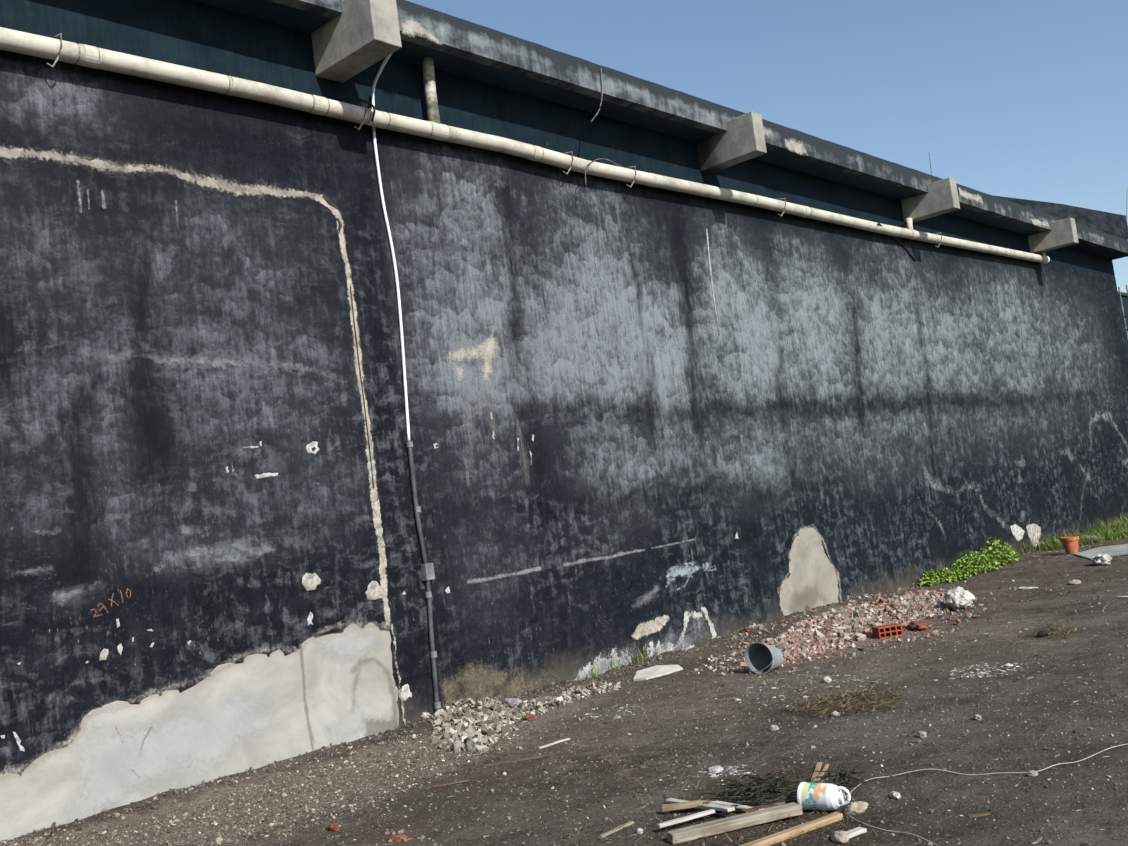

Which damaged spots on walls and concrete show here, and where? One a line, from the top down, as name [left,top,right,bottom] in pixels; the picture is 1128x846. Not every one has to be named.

flaking render [0,146,391,625]
leakage [673,213,697,410]
peeling [86,637,134,663]
peeling [574,607,717,681]